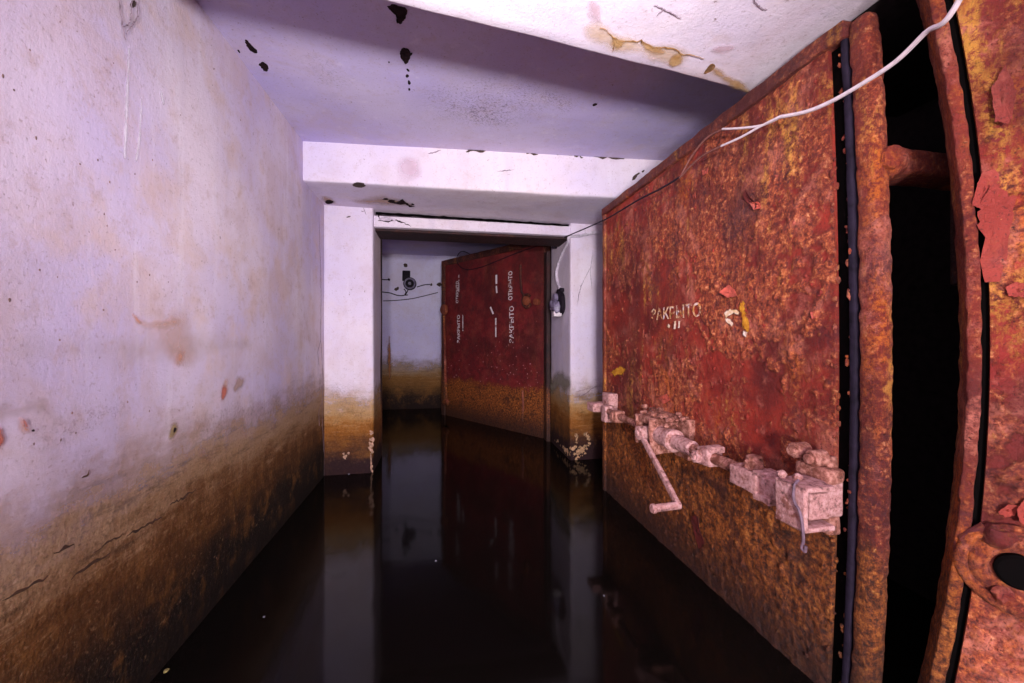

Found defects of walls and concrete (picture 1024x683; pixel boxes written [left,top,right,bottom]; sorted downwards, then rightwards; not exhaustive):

spalling [387,4,407,24]
corrosion [591,27,682,66]
peeling [991,65,1017,125]
corrosion [829,116,847,190]
corrosion [804,225,852,307]
peeling [972,169,1024,297]
corrosion [608,206,722,494]
corrosion [739,286,771,341]
damp [550,374,603,460]
corrosion [832,391,850,440]
damp [0,361,442,683]
corrosion [827,527,846,588]